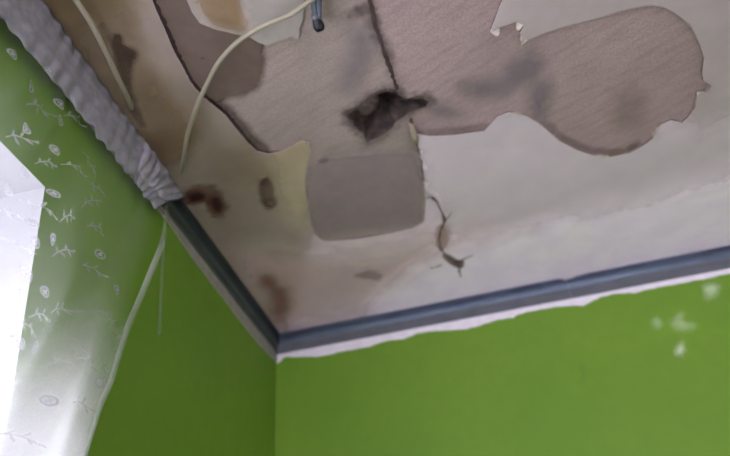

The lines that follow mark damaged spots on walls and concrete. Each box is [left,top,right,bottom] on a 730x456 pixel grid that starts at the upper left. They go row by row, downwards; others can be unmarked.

damp [43,0,414,333]
peeling [152,0,711,240]
crack [415,142,473,277]